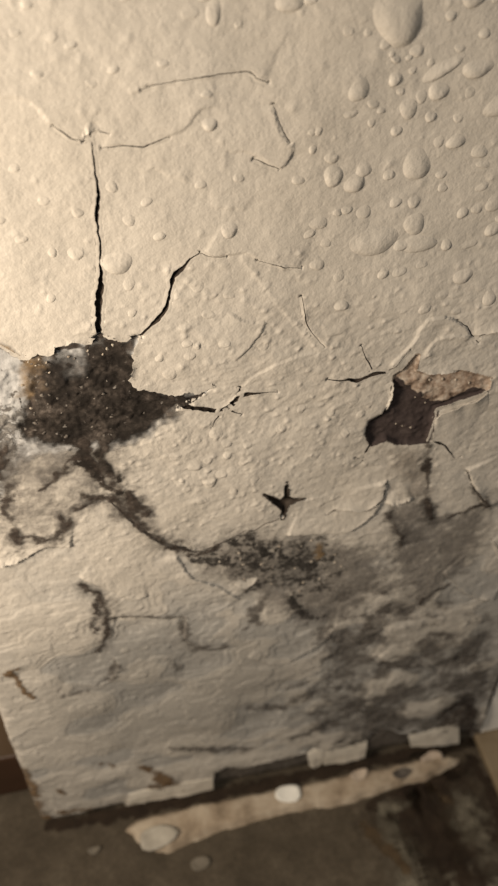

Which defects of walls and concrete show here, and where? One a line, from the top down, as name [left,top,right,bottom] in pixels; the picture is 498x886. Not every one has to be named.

crack [140,67,293,144]
crack [253,155,281,172]
crack [51,123,170,338]
crack [134,249,226,341]
crack [256,258,301,272]
peeling [0,332,238,497]
crack [176,386,277,427]
flaking render [364,353,497,447]
crack [108,482,305,554]
leakage [0,337,498,747]
peeling [126,724,459,806]
peeling [140,824,178,852]